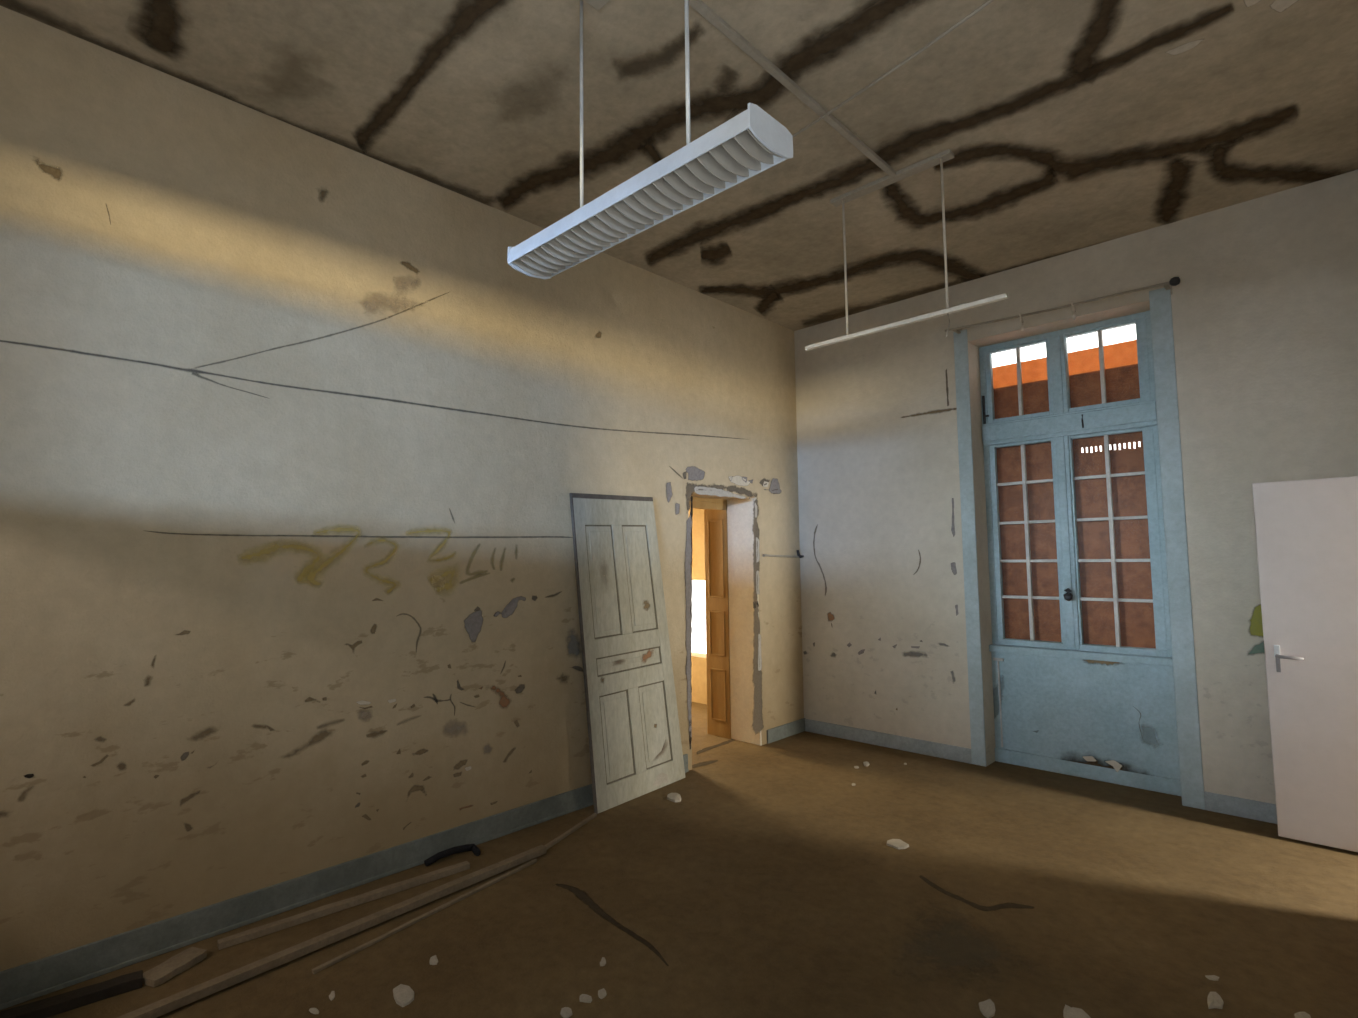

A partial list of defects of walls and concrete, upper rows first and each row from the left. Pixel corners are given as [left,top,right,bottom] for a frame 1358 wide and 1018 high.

water stain [0,0,920,209]
water stain [646,0,1233,264]
water stain [883,105,1345,228]
water stain [699,250,1069,325]
crack [0,293,740,439]
spalling [480,661,525,707]
spalling [464,591,562,642]
spalling [666,466,782,749]